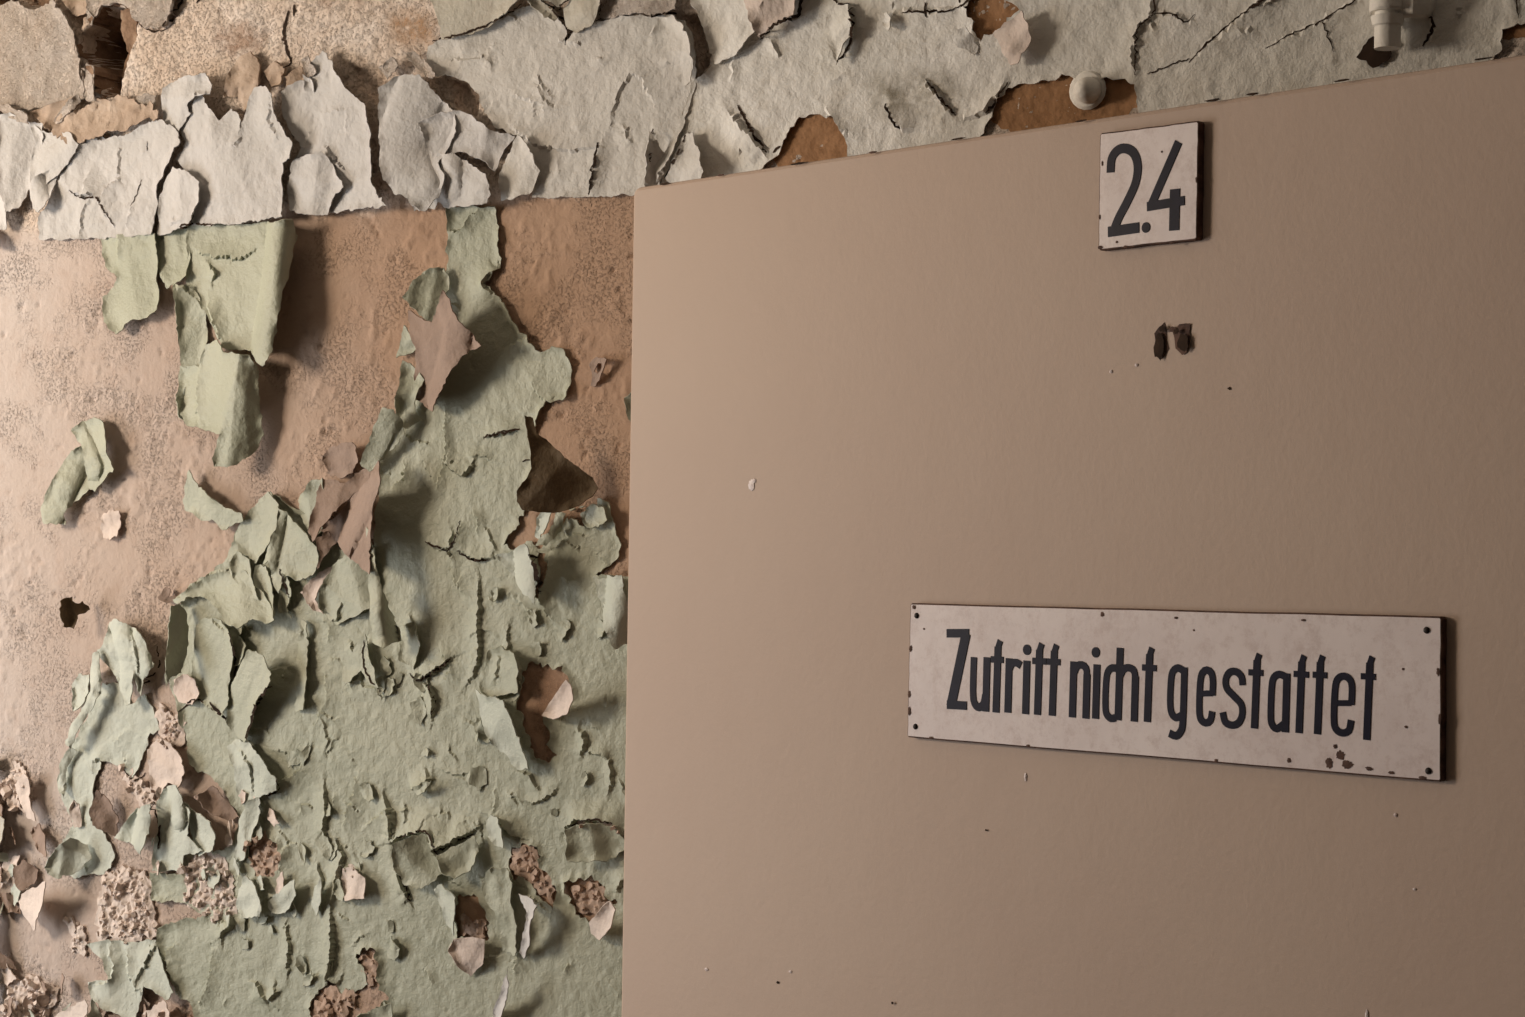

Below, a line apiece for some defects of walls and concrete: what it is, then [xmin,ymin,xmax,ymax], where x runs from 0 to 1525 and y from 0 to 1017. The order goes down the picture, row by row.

crack [0,0,200,111]
crack [759,0,855,63]
crack [902,0,968,18]
crack [1134,0,1264,75]
crack [1266,0,1356,52]
crack [1422,16,1436,47]
peeling [378,0,1525,211]
peeling [0,3,387,467]
peeling [40,205,628,1017]
spalling [0,760,36,845]
peeling [0,852,46,931]
spalling [0,952,65,1017]